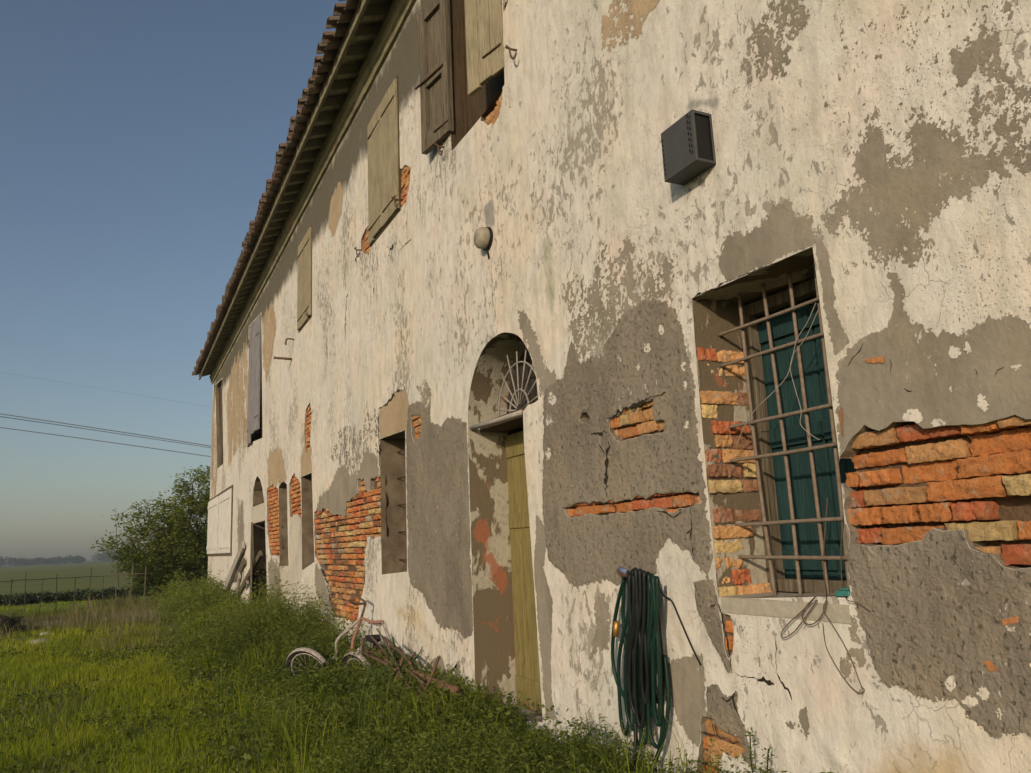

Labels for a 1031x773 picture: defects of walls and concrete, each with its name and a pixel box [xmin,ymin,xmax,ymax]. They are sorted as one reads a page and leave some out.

peeling [601,0,660,51]
flaking render [237,499,245,580]
peeling [266,380,473,639]
peeling [518,234,734,722]
peeling [718,0,1031,741]
peeling [668,653,754,773]